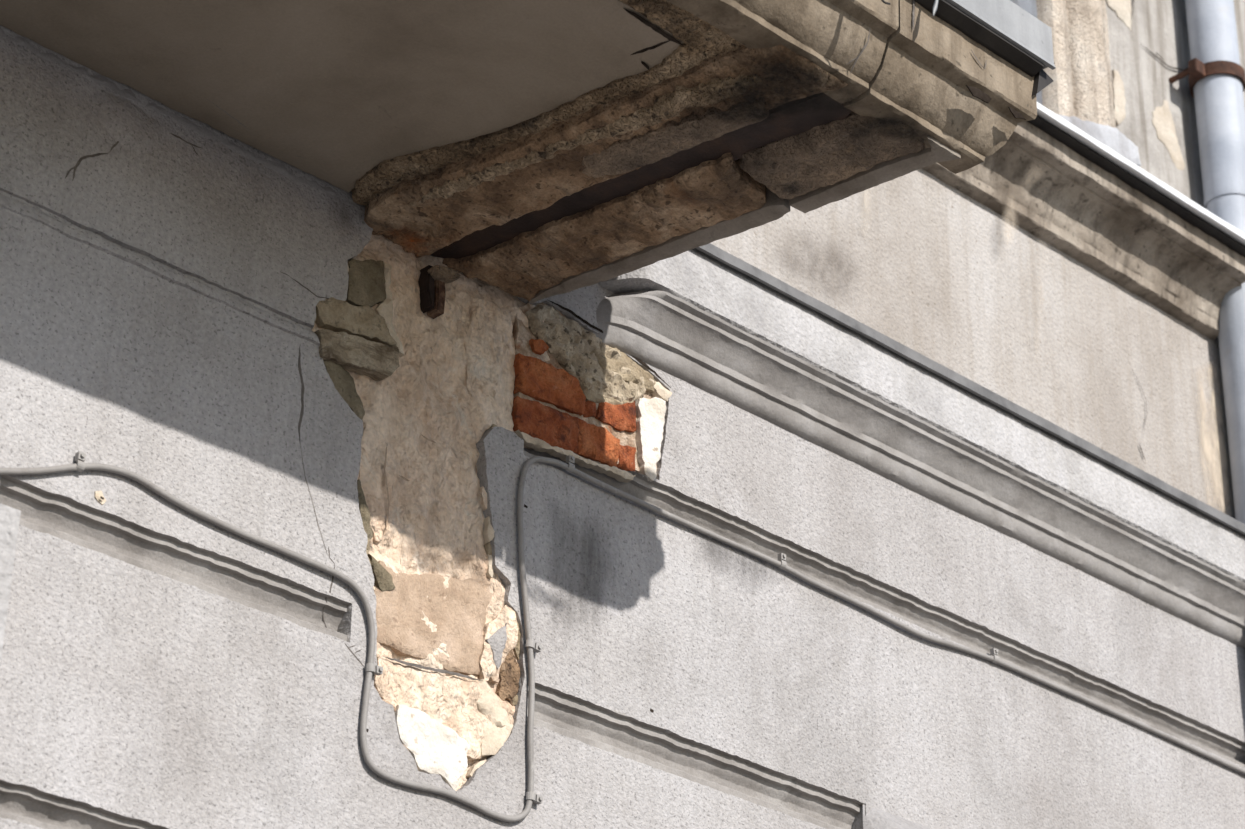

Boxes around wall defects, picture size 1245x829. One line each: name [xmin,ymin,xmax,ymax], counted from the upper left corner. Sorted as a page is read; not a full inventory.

peeling [1105,0,1132,30]
peeling [1111,69,1126,126]
crack [65,141,119,181]
spalling [407,74,765,206]
peeling [1152,100,1185,170]
crack [298,347,365,667]
flaking render [312,235,672,791]